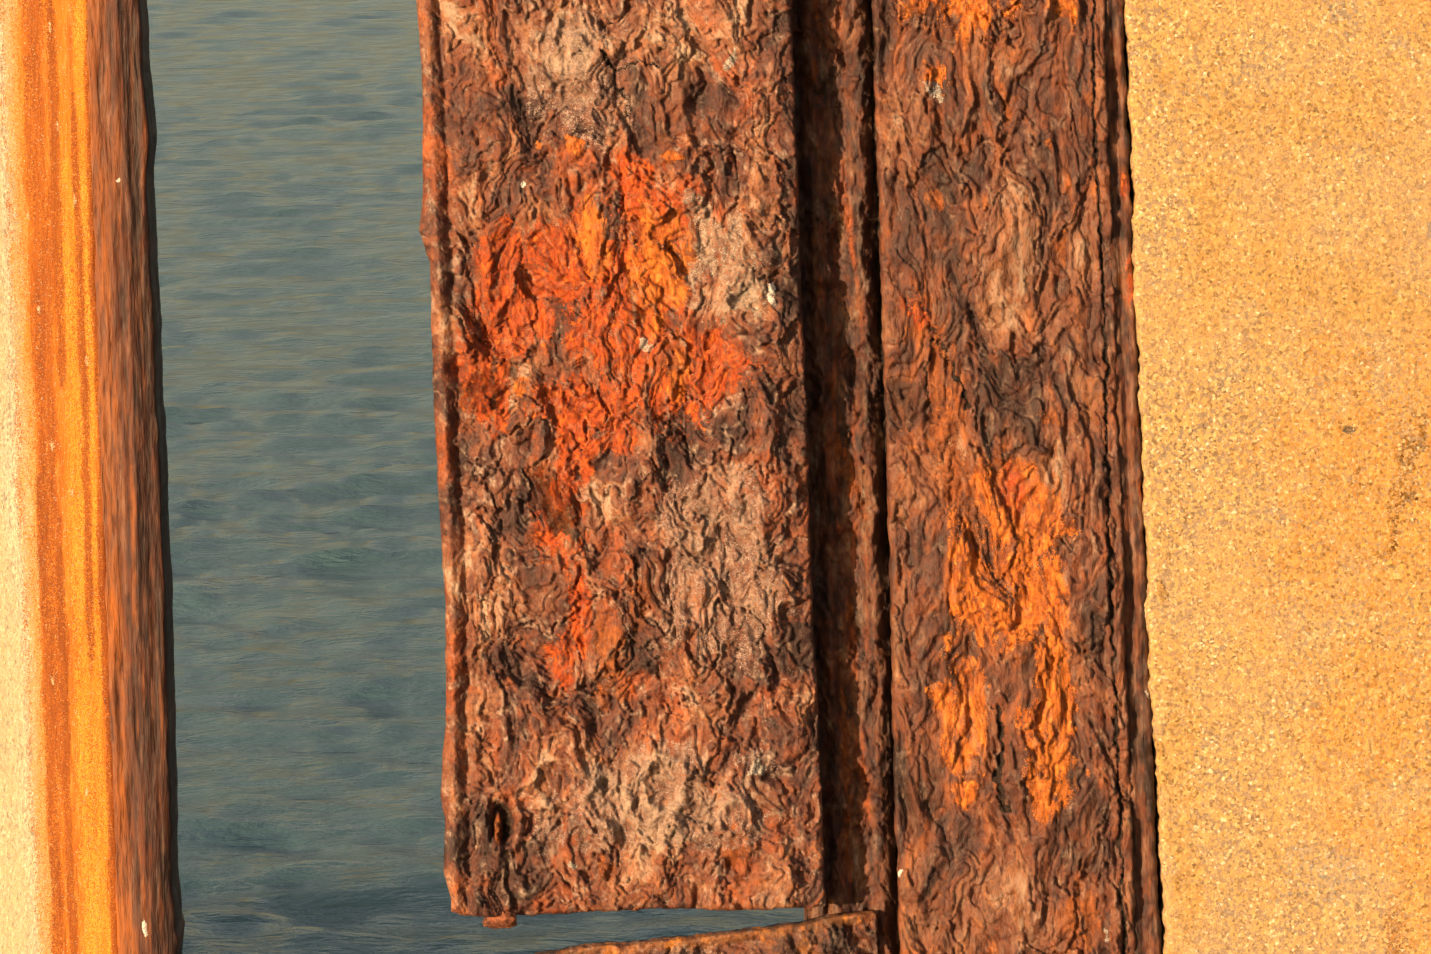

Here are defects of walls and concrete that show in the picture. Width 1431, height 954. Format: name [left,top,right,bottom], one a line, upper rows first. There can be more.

rust [892,0,1022,96]
rust [1046,0,1080,30]
rust [922,185,948,214]
rust [1119,171,1130,204]
rust [1122,251,1134,309]
rust [0,0,118,954]
rust [451,134,771,719]
rust [899,288,1091,826]
rust [530,735,783,881]
rust [836,574,862,861]
crack [990,703,1012,813]
rust [482,910,517,929]